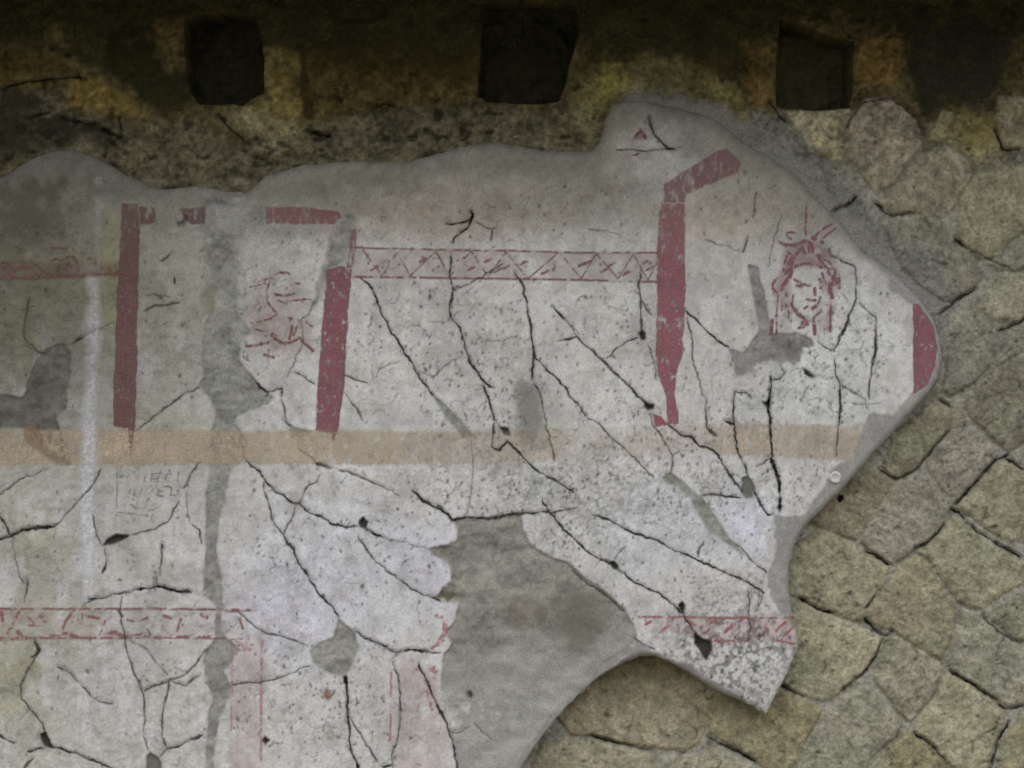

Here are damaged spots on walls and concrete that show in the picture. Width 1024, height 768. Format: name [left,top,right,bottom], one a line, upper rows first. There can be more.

crack [834,197,910,216]
crack [145,254,180,311]
crack [24,299,82,355]
crack [822,260,877,456]
crack [136,387,200,431]
efflorescence [80,380,95,601]
crack [247,210,782,768]
crack [867,551,889,565]
crack [0,464,202,768]
crack [233,615,309,685]
crack [799,598,833,613]
crack [842,596,893,690]